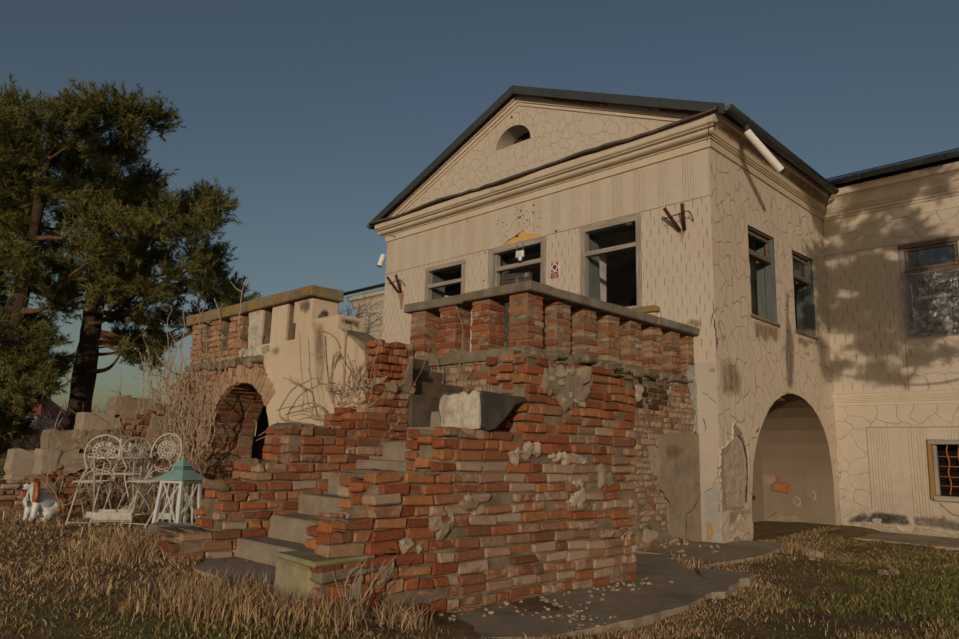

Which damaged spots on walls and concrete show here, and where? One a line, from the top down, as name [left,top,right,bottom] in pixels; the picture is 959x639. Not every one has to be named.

water stain [756,319,807,384]
peeling [548,369,586,407]
flaking render [663,422,749,559]